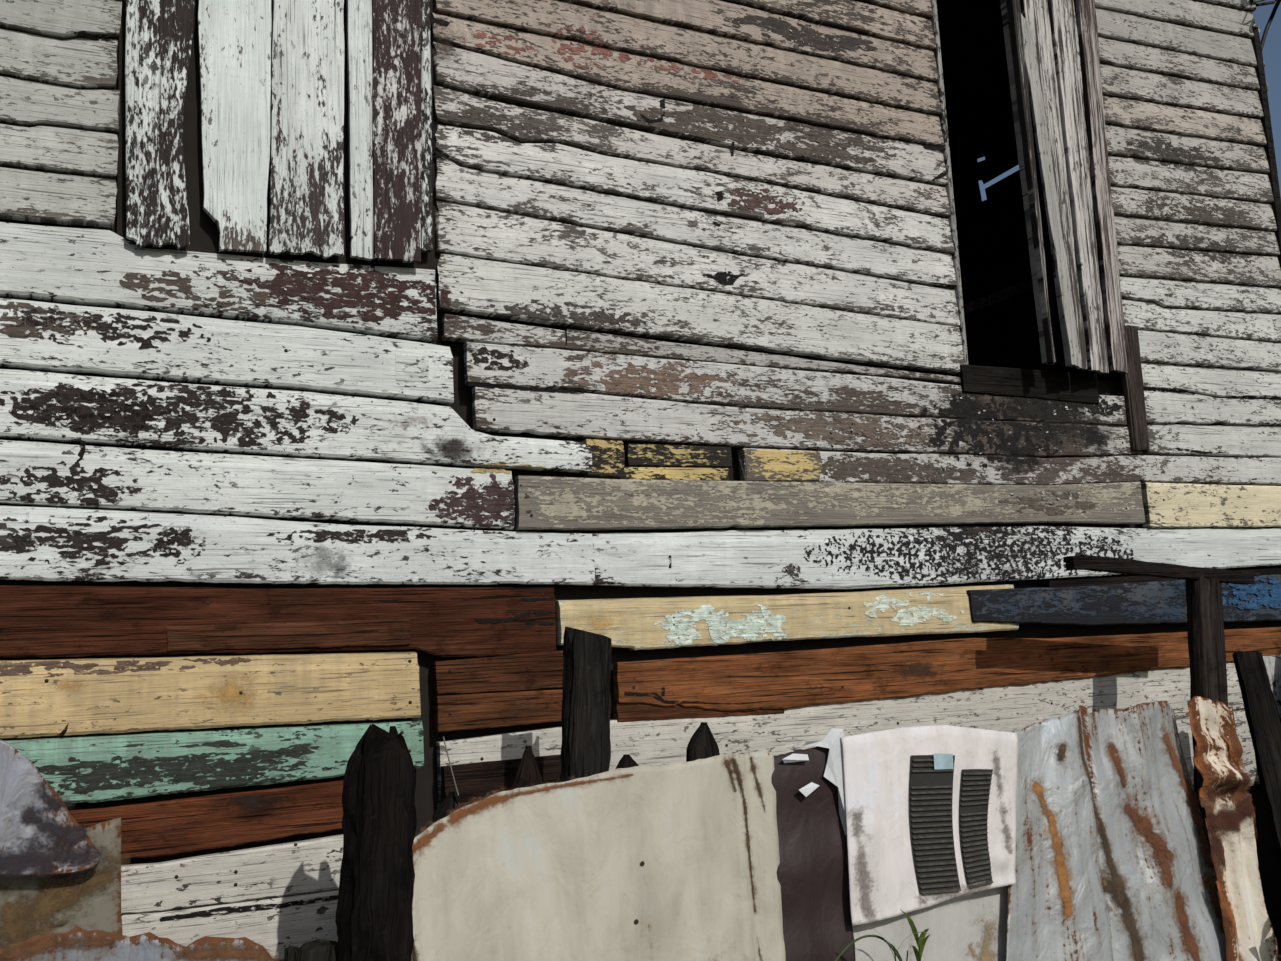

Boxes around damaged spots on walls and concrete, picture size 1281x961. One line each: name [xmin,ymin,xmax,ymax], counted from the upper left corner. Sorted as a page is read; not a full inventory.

peeling [0,263,463,351]
peeling [470,347,531,371]
peeling [0,381,359,447]
peeling [0,461,206,567]
peeling [267,529,432,543]
peeling [429,463,546,533]
corrosion [1033,782,1073,918]
corrosion [1057,716,1147,961]
corrosion [1105,744,1200,961]
corrosion [1163,707,1255,961]
corrosion [0,933,116,960]
corrosion [179,942,278,961]